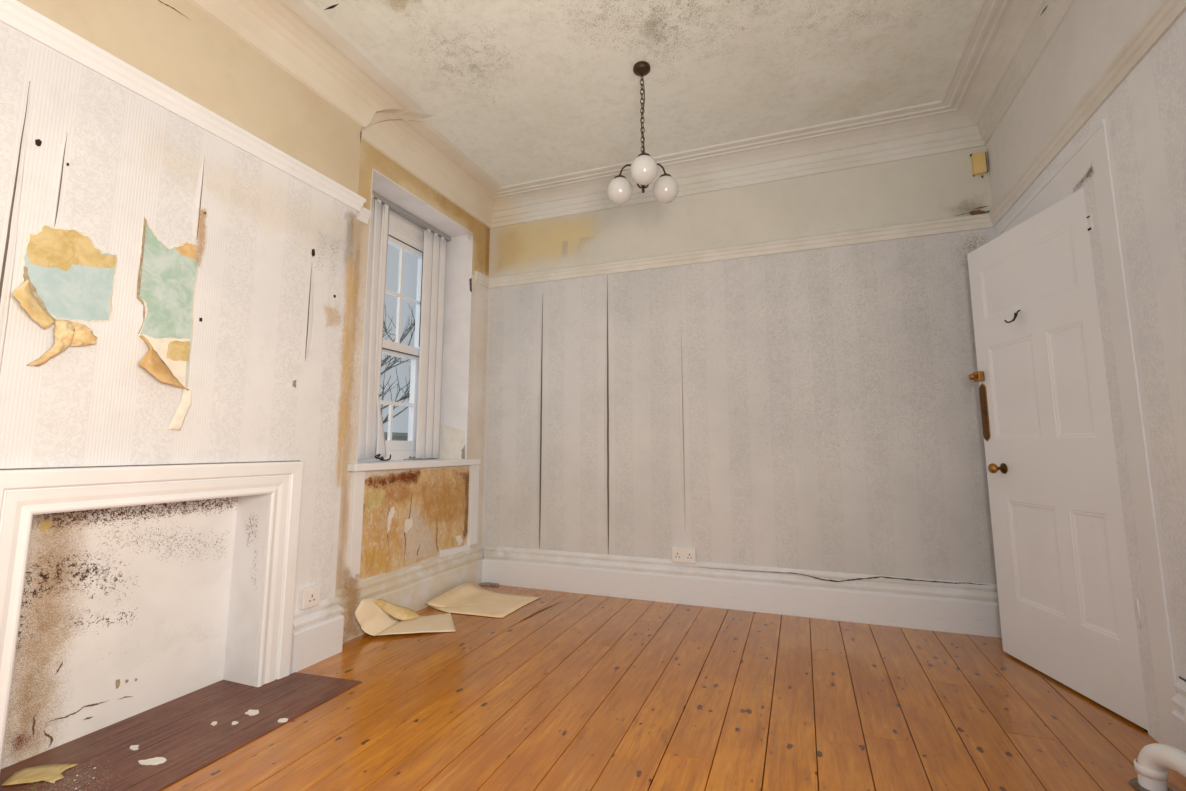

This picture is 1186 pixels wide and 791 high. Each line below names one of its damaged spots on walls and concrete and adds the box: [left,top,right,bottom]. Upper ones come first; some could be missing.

damp [513,0,943,83]
flaking render [27,226,116,271]
flaking render [140,334,190,387]
damp [116,115,616,642]
flaking render [360,468,471,579]
crack [702,567,985,585]
damp [1,497,238,769]